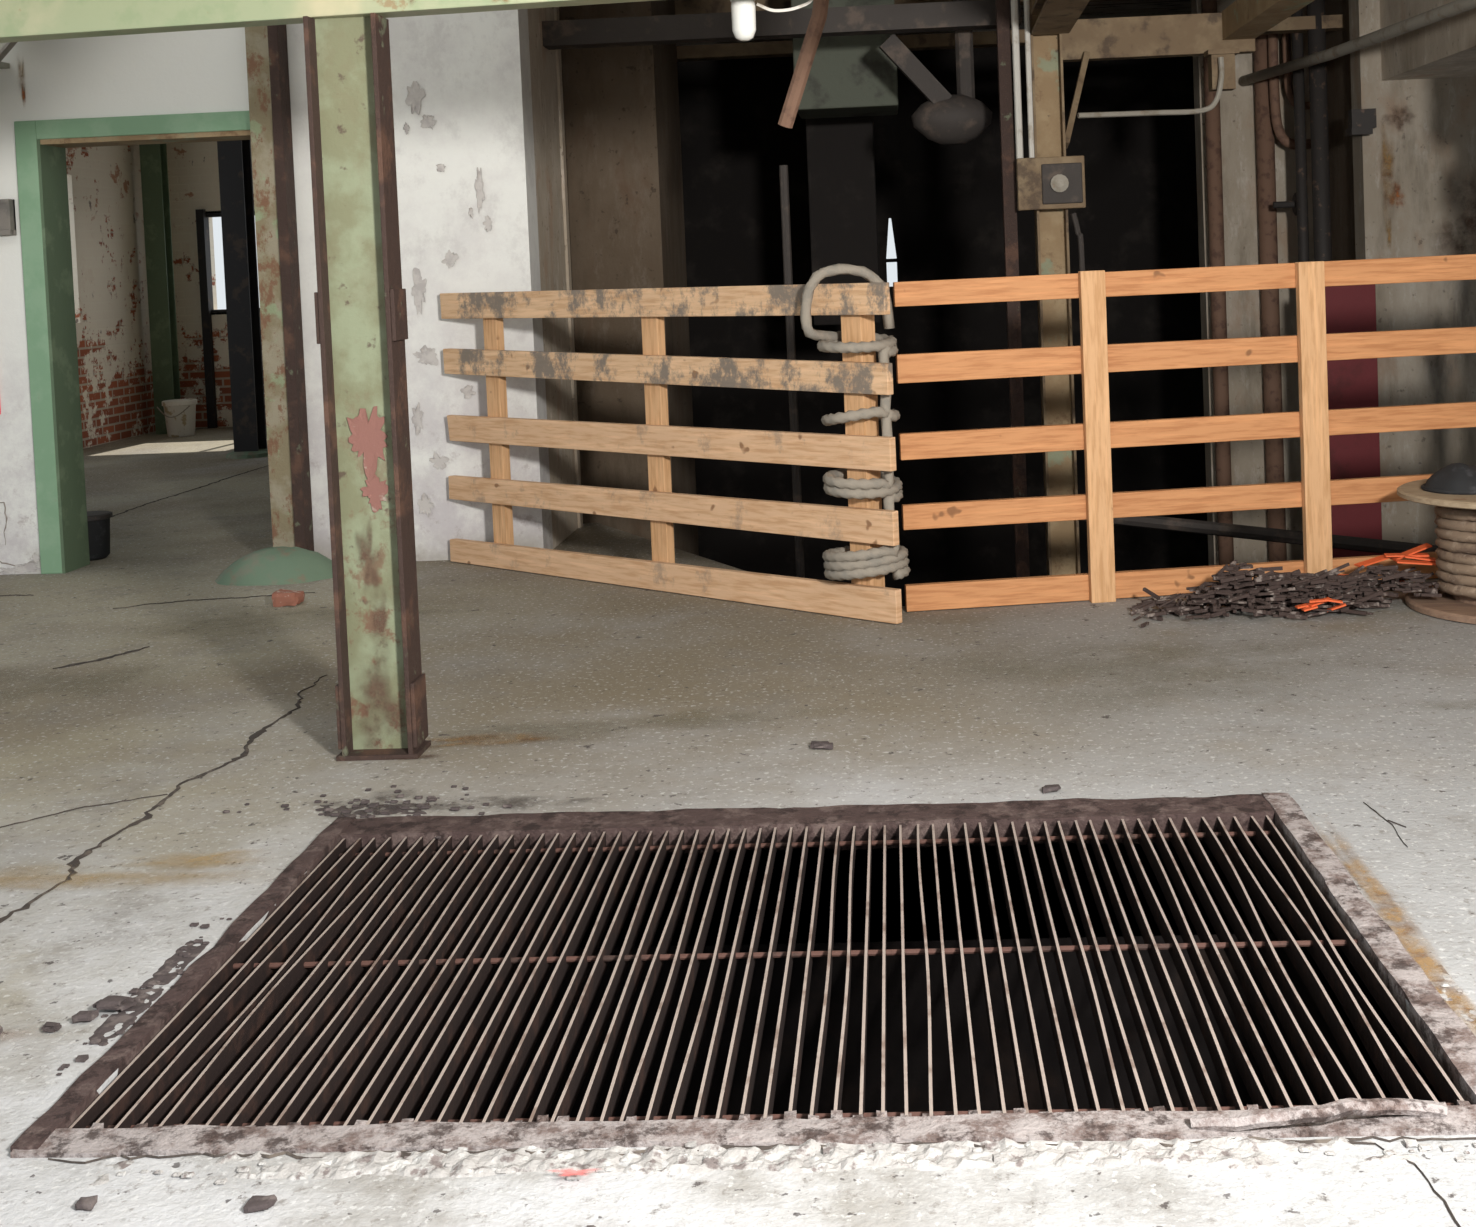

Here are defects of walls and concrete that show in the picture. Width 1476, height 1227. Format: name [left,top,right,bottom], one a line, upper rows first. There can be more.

peeling [347,406,389,513]
crack [0,675,327,923]
crack [48,1151,323,1164]
crack [362,1143,826,1158]
crack [869,1139,1094,1149]
crack [1159,1136,1476,1227]